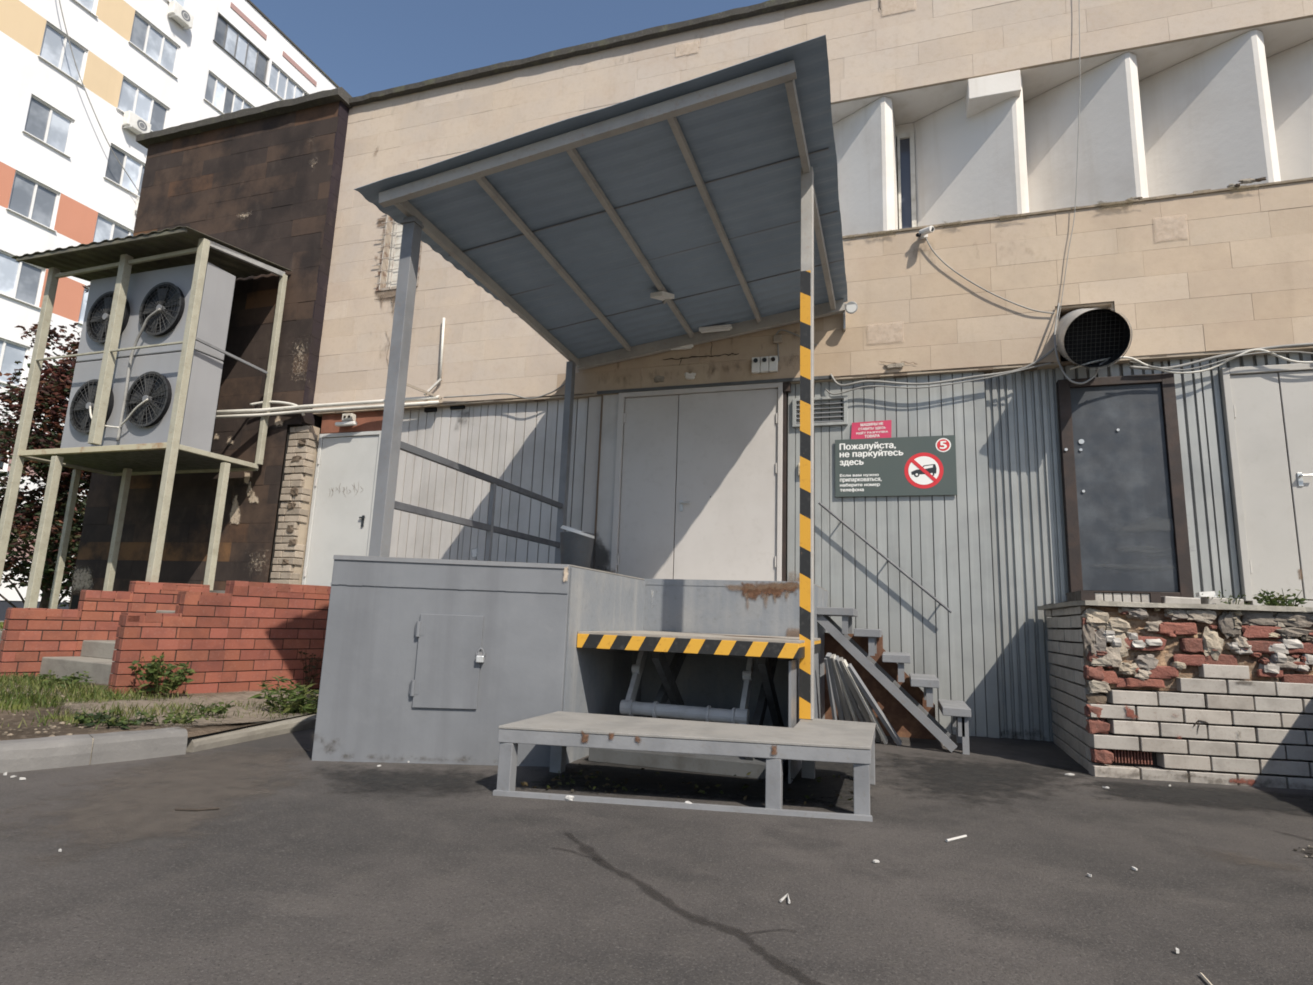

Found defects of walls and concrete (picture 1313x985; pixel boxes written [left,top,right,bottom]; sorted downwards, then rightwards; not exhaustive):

rust [728,578,800,607]
spalling [1080,606,1313,765]